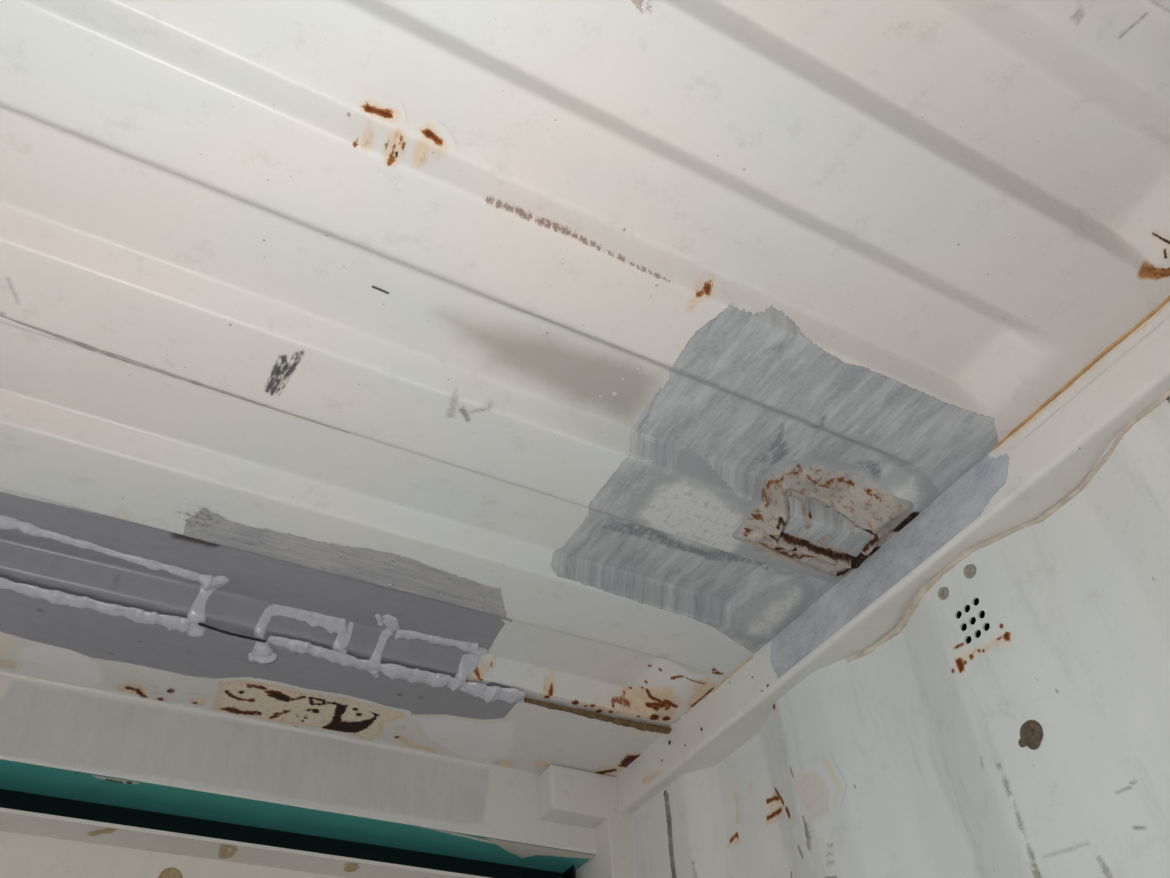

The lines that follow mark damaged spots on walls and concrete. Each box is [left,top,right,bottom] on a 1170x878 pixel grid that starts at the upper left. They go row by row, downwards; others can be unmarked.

rust [348,89,458,182]
rust [1131,219,1170,284]
rust [989,301,1170,459]
rust [732,456,919,585]
leakage [0,631,32,656]
rust [948,623,1023,683]
rust [107,677,446,755]
rust [533,665,724,727]
rust [586,750,645,777]
rust [761,785,794,830]